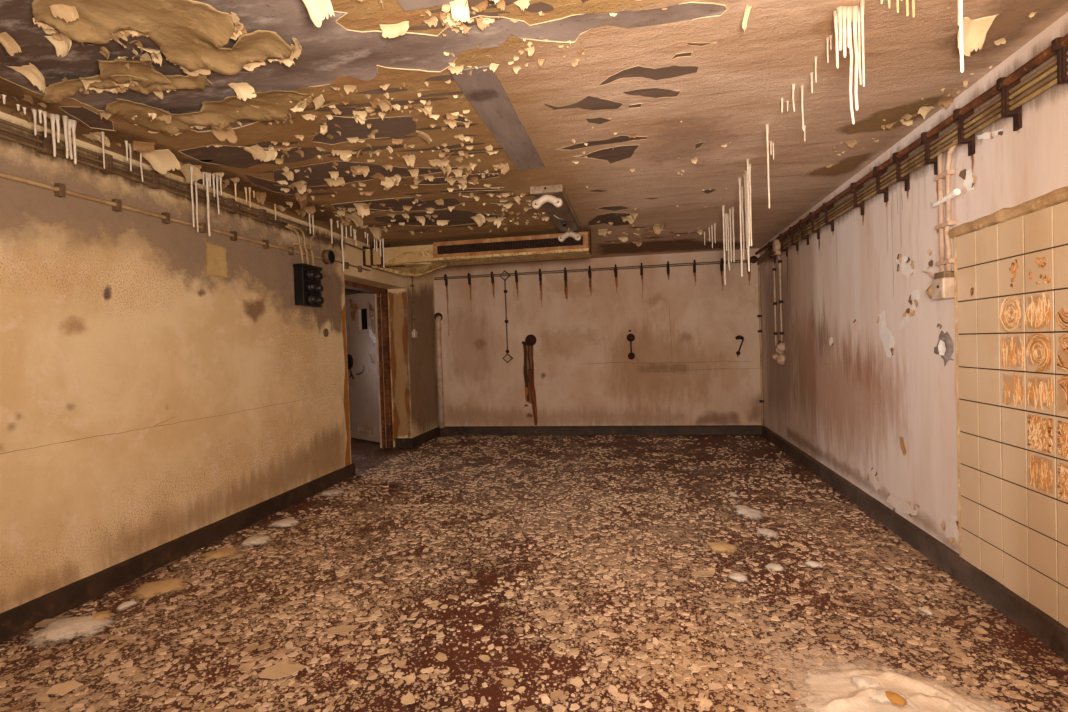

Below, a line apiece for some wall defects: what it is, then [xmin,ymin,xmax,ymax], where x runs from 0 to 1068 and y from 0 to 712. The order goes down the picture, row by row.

leakage [950,0,1062,54]
peeling [0,0,728,247]
leakage [843,97,941,134]
leakage [0,157,343,332]
spalling [877,289,920,358]
spalling [934,323,954,367]
corrosion [523,345,537,425]
spalling [867,467,919,516]
leakage [201,518,299,561]
spalling [940,511,959,545]
leakage [30,578,187,644]
leakage [793,660,1008,712]